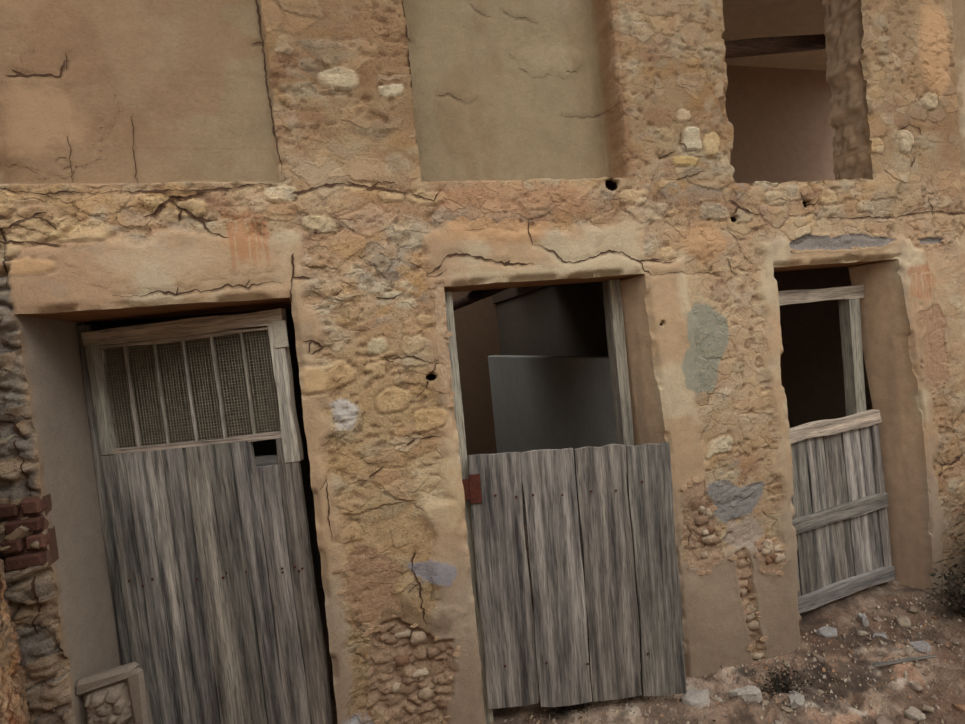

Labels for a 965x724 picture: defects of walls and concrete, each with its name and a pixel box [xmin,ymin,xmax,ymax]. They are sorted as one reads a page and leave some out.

crack [0,0,440,287]
crack [426,200,764,277]
spalling [333,529,461,724]
crack [408,552,427,626]
spalling [677,474,791,665]